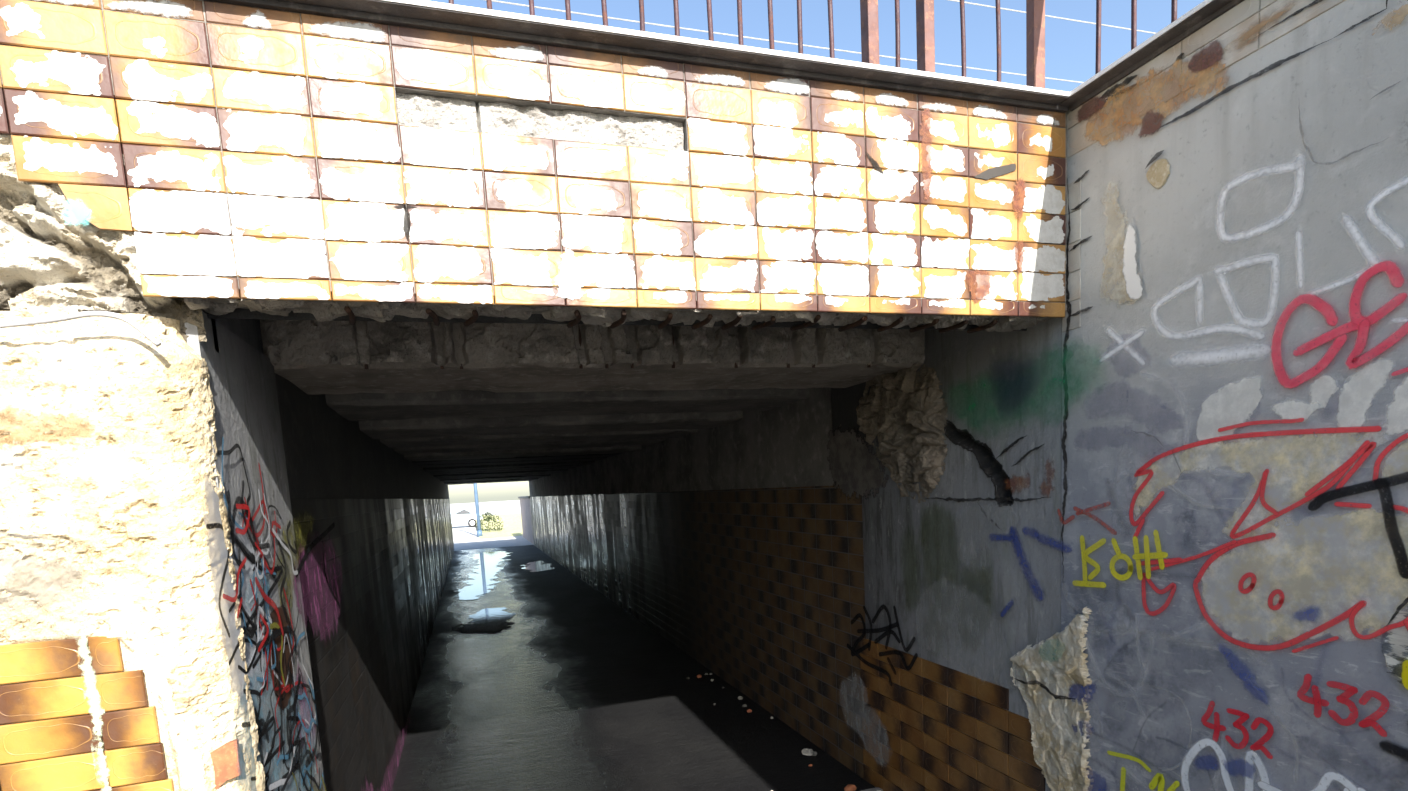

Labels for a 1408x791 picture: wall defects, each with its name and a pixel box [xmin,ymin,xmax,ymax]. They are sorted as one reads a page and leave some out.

spalling [0,2,1066,342]
crack [925,170,1093,573]
spalling [1010,606,1093,791]